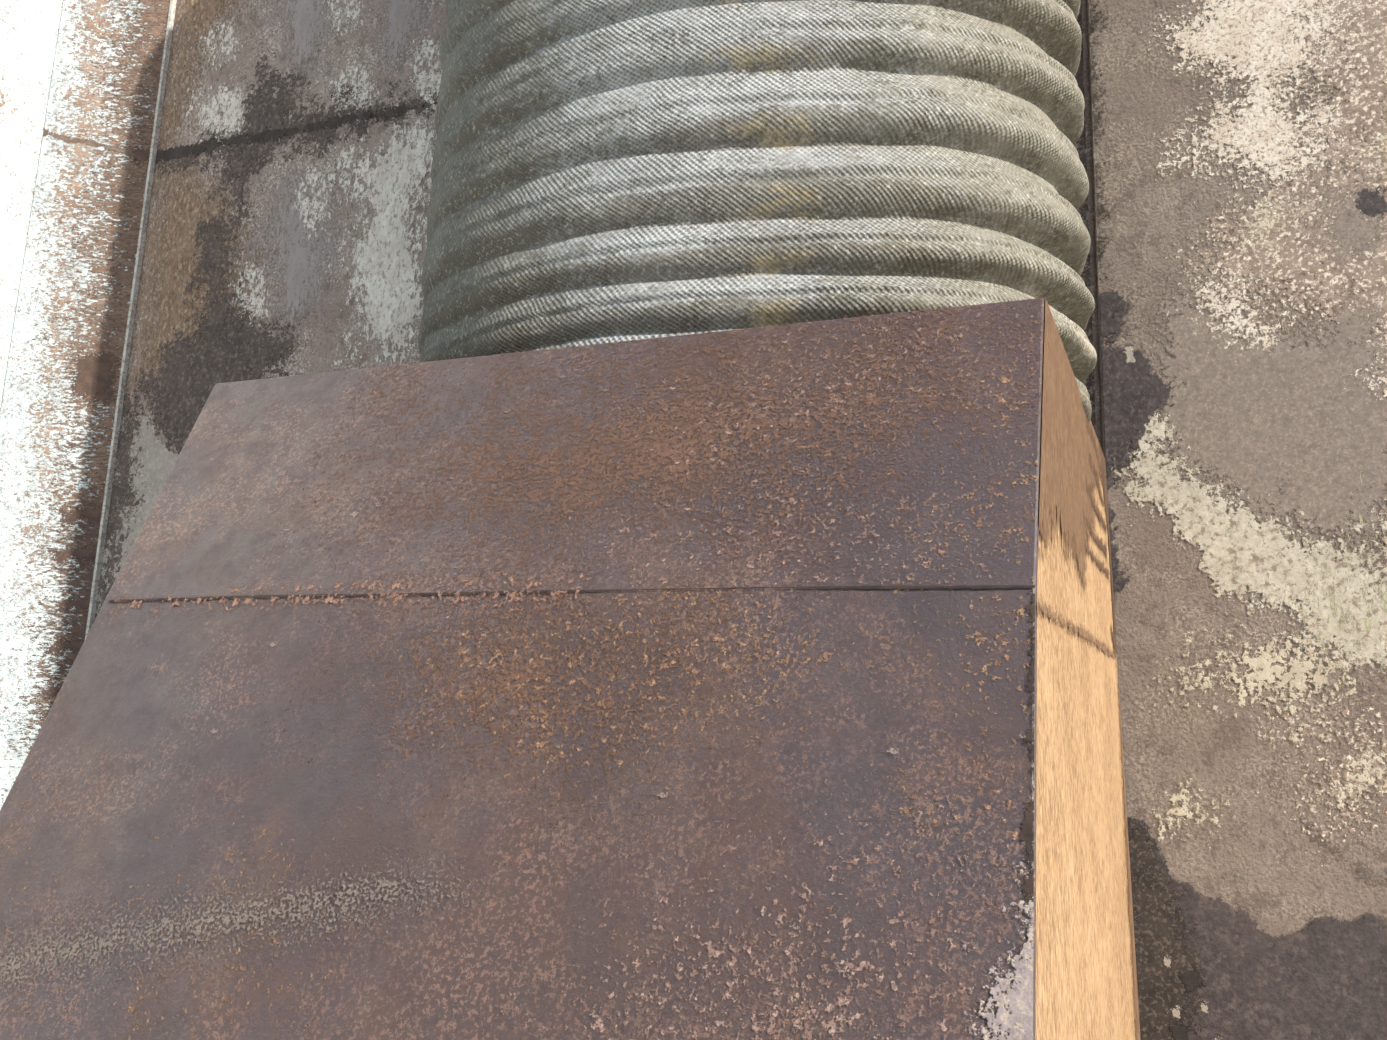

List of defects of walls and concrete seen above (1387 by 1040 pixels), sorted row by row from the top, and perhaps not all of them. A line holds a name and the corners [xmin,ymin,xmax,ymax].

crack [43,127,150,168]
damp [132,0,444,454]
rust [1160,0,1387,387]
rust [1116,659,1141,1040]
damp [1127,816,1387,1040]
rust [1241,664,1387,876]